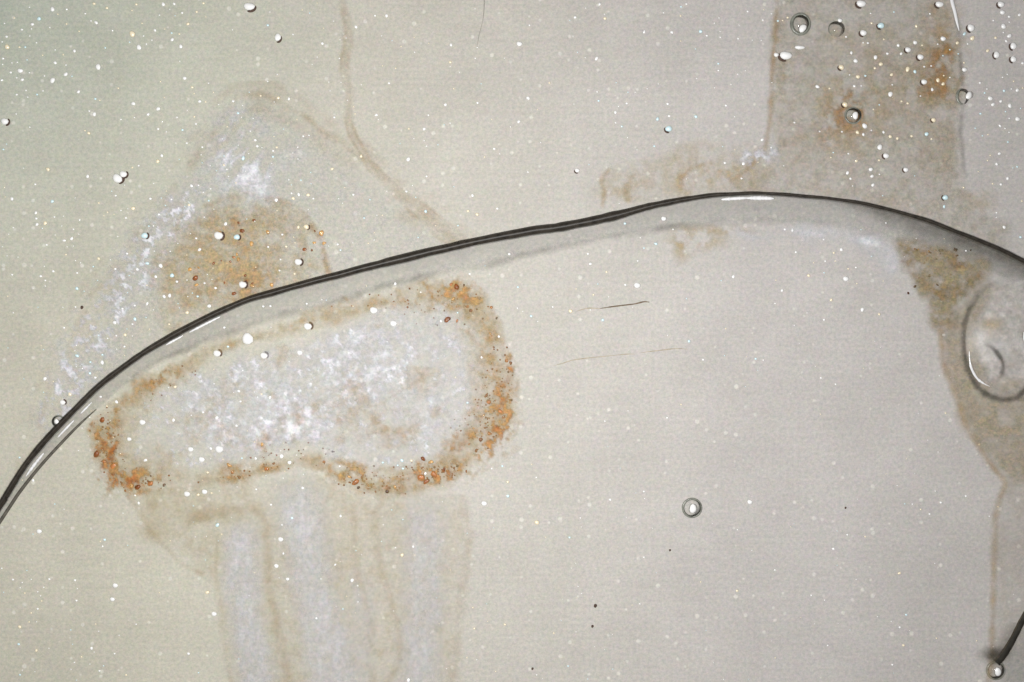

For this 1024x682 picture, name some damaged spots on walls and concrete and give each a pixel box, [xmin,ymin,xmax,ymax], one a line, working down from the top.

leakage [923,33,953,99]
leakage [215,135,309,249]
leakage [40,190,196,422]
rust [166,215,279,306]
rust [367,281,513,458]
leakage [947,288,1024,474]
rust [89,407,171,494]
rust [220,442,309,482]
rust [337,457,467,495]